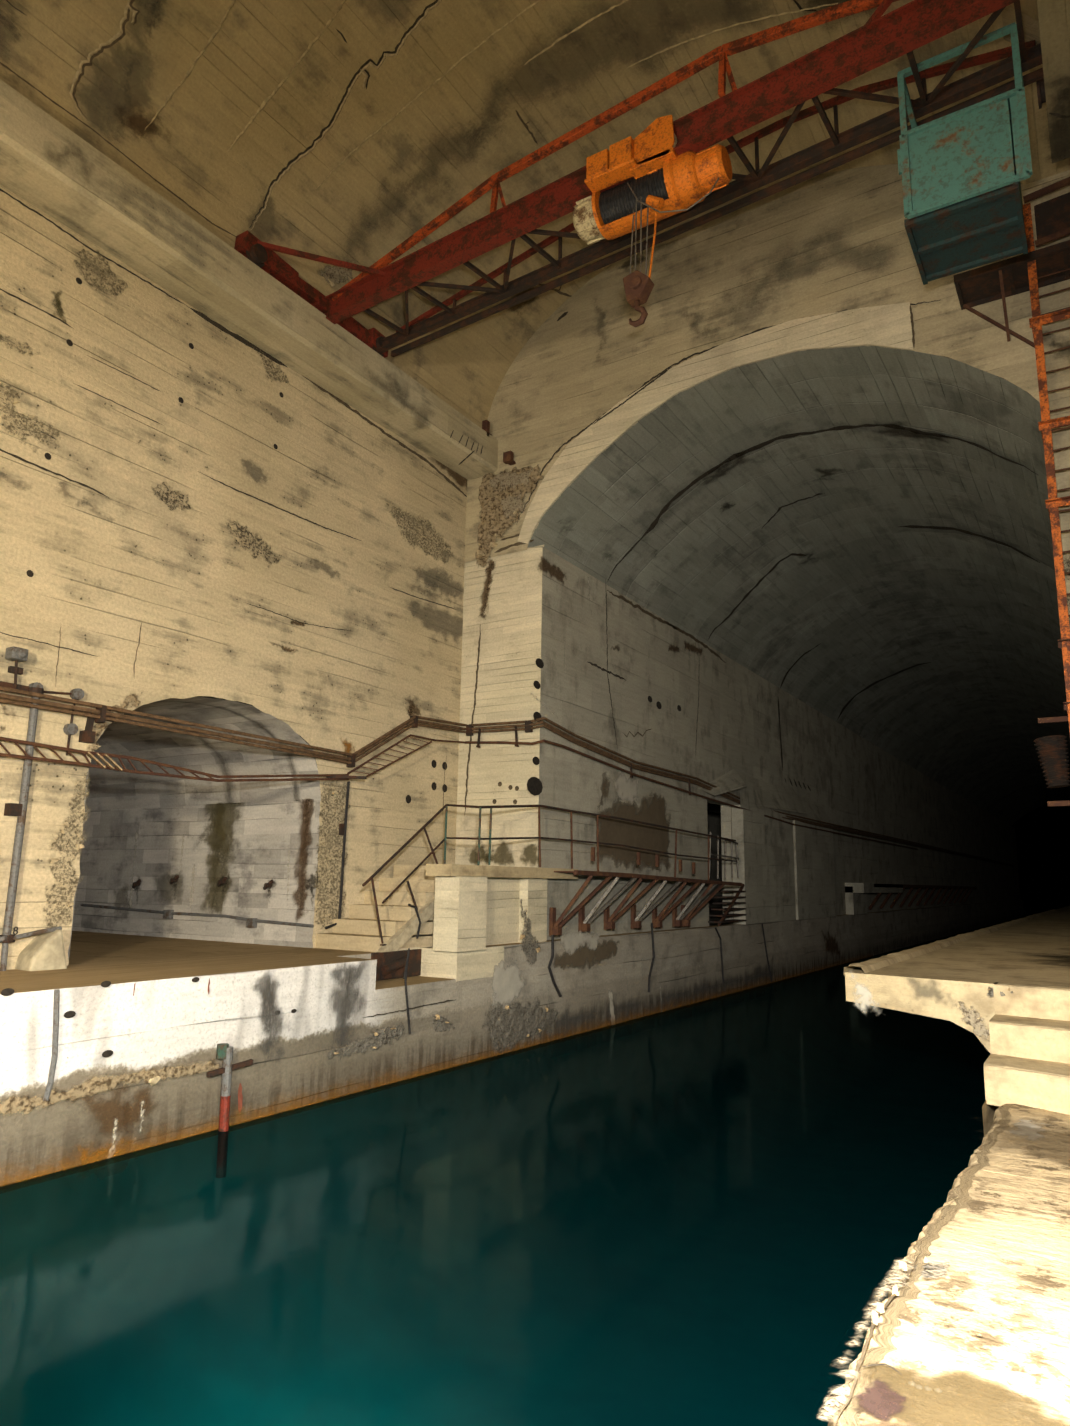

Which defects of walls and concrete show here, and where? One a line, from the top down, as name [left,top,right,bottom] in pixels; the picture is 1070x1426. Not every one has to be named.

crack [70,0,140,122]
crack [249,0,442,230]
crack [516,111,538,144]
spalling [475,465,544,567]
spalling [44,774,90,928]
water stain [172,770,243,912]
spalling [313,780,350,929]
water stain [0,955,874,1186]
water stain [867,1363,1070,1426]